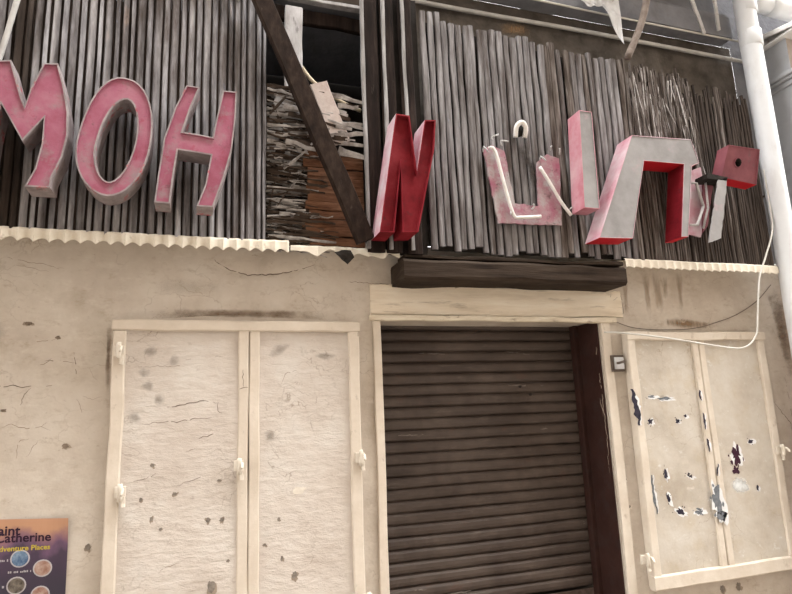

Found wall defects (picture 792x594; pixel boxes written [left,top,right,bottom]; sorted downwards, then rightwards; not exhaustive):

peeling [630,389,675,427]
peeling [728,438,756,474]
peeling [651,464,729,525]